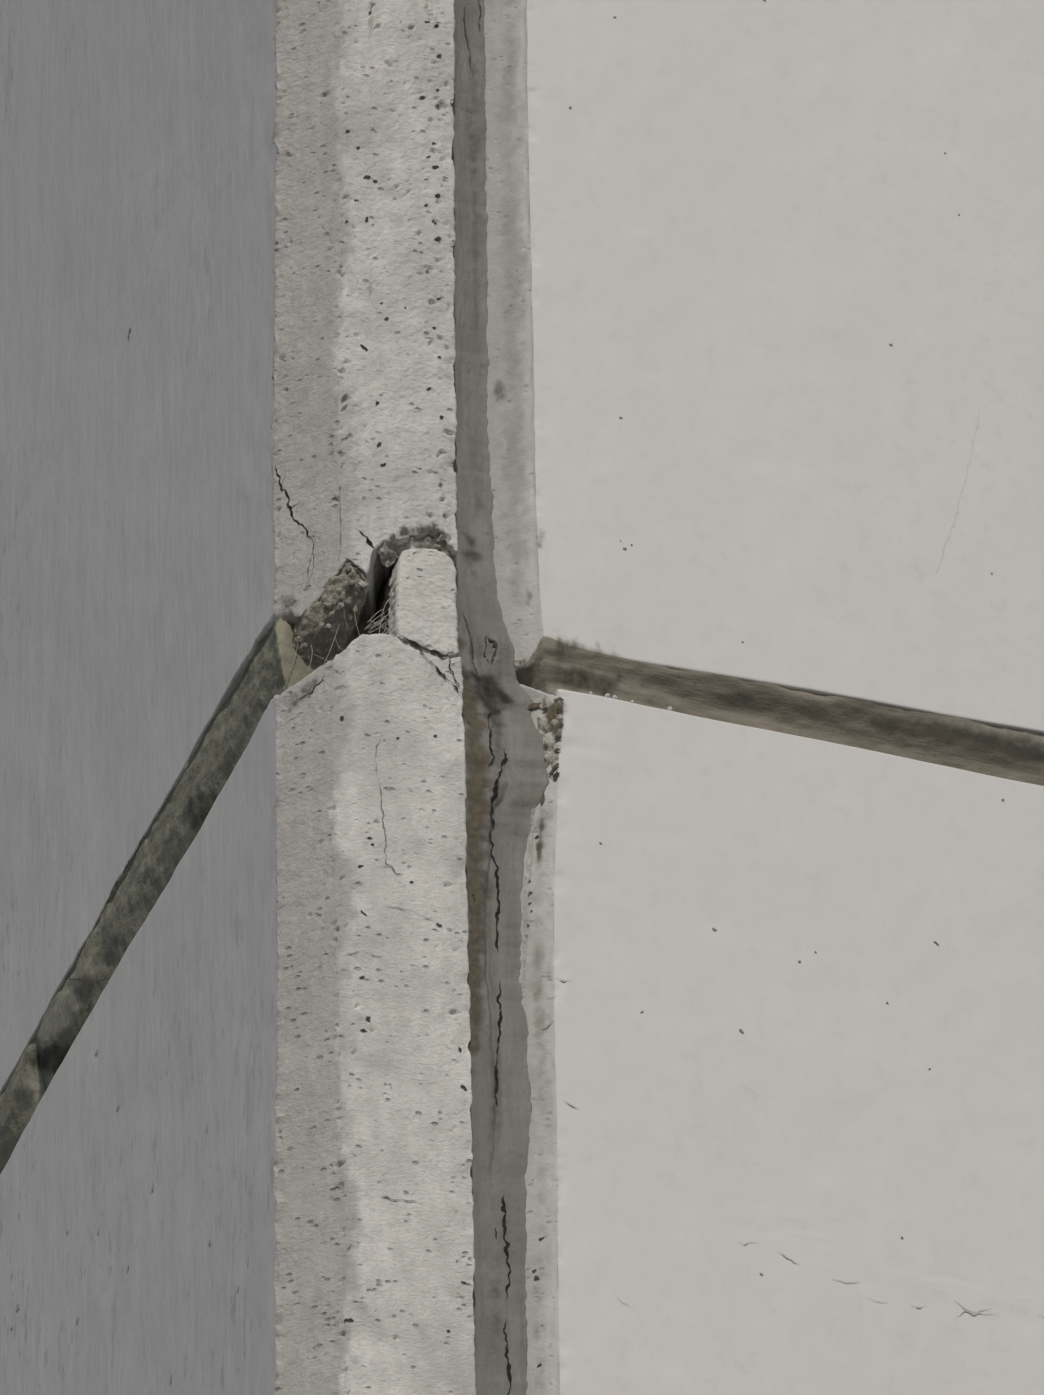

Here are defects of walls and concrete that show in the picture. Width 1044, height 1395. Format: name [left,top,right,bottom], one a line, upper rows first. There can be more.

crack [275,467,375,580]
spalling [377,527,455,567]
spalling [292,561,369,667]
crack [394,633,460,693]